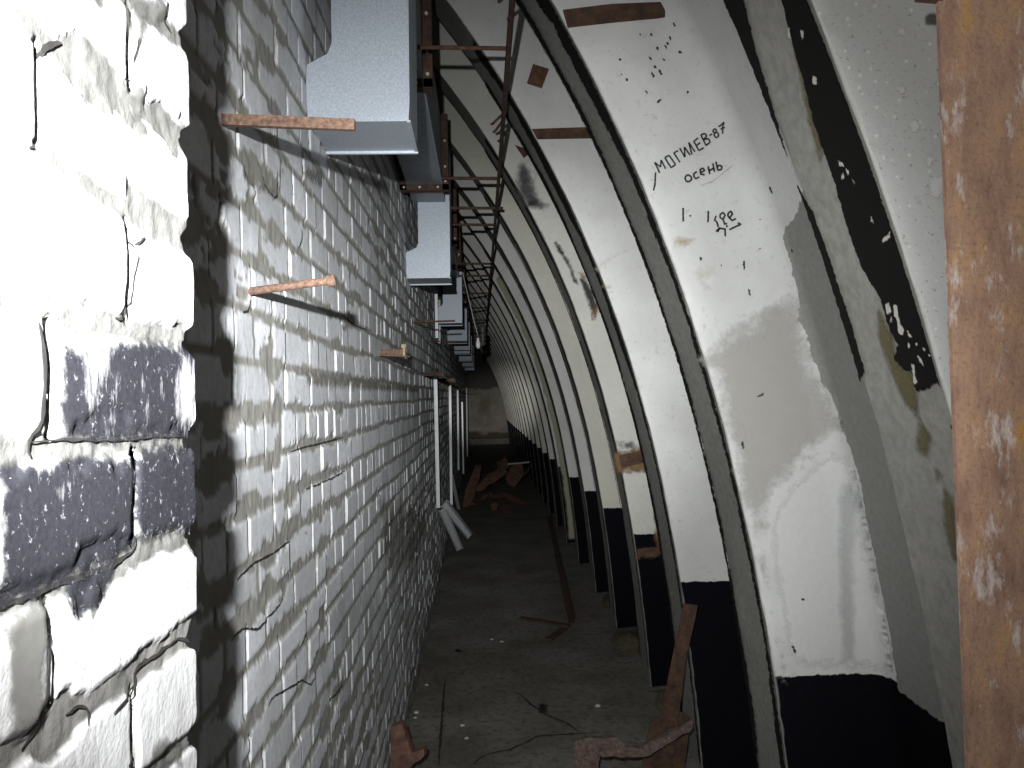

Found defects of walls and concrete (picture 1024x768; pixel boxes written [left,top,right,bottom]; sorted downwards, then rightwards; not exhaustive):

crack [34,40,62,61]
peeling [723,0,788,158]
peeling [781,0,940,391]
crack [115,218,145,320]
peeling [783,185,945,722]
crack [238,540,290,579]
crack [232,600,282,640]